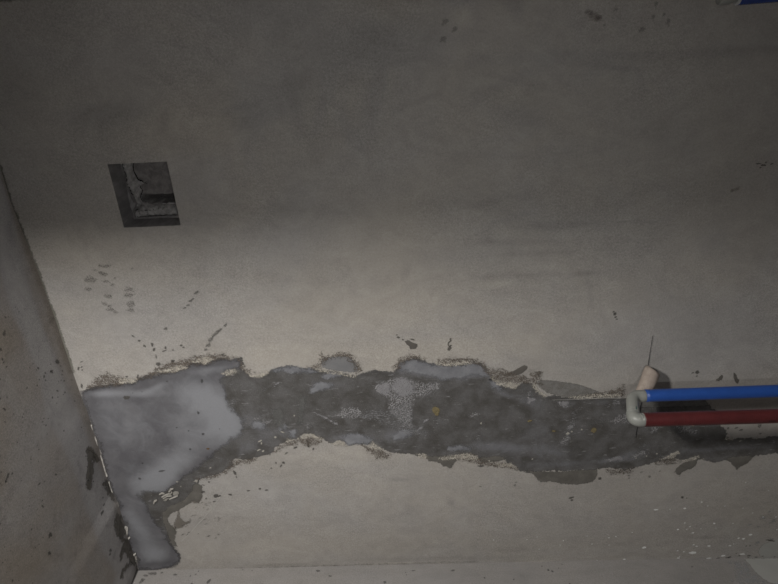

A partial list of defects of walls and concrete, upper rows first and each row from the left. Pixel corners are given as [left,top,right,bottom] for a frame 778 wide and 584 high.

damp [81,335,243,579]
spalling [82,352,778,571]